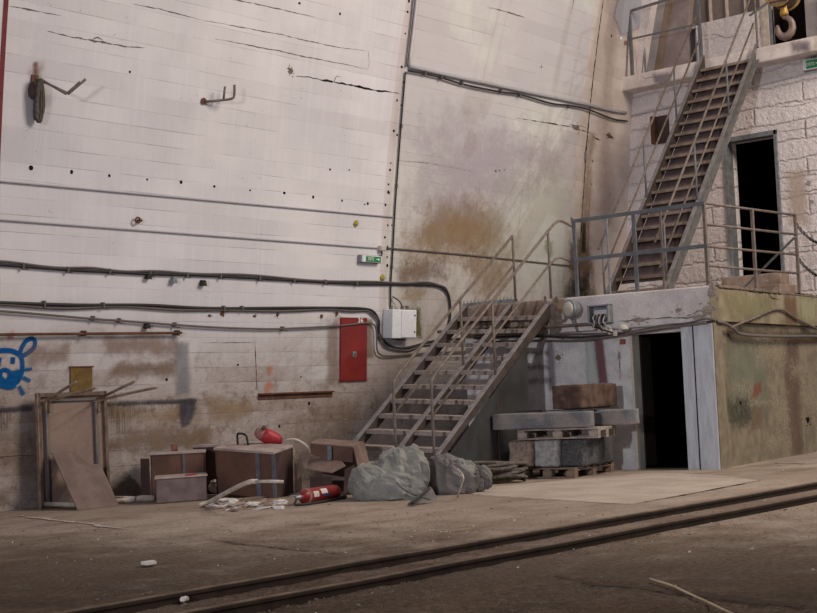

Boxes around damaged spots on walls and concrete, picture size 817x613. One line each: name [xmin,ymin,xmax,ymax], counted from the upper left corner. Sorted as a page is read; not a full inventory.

crack [10,6,142,48]
crack [135,4,399,94]
crack [237,0,313,17]
leakage [565,223,594,298]
leakage [727,329,817,453]
crack [21,515,126,529]